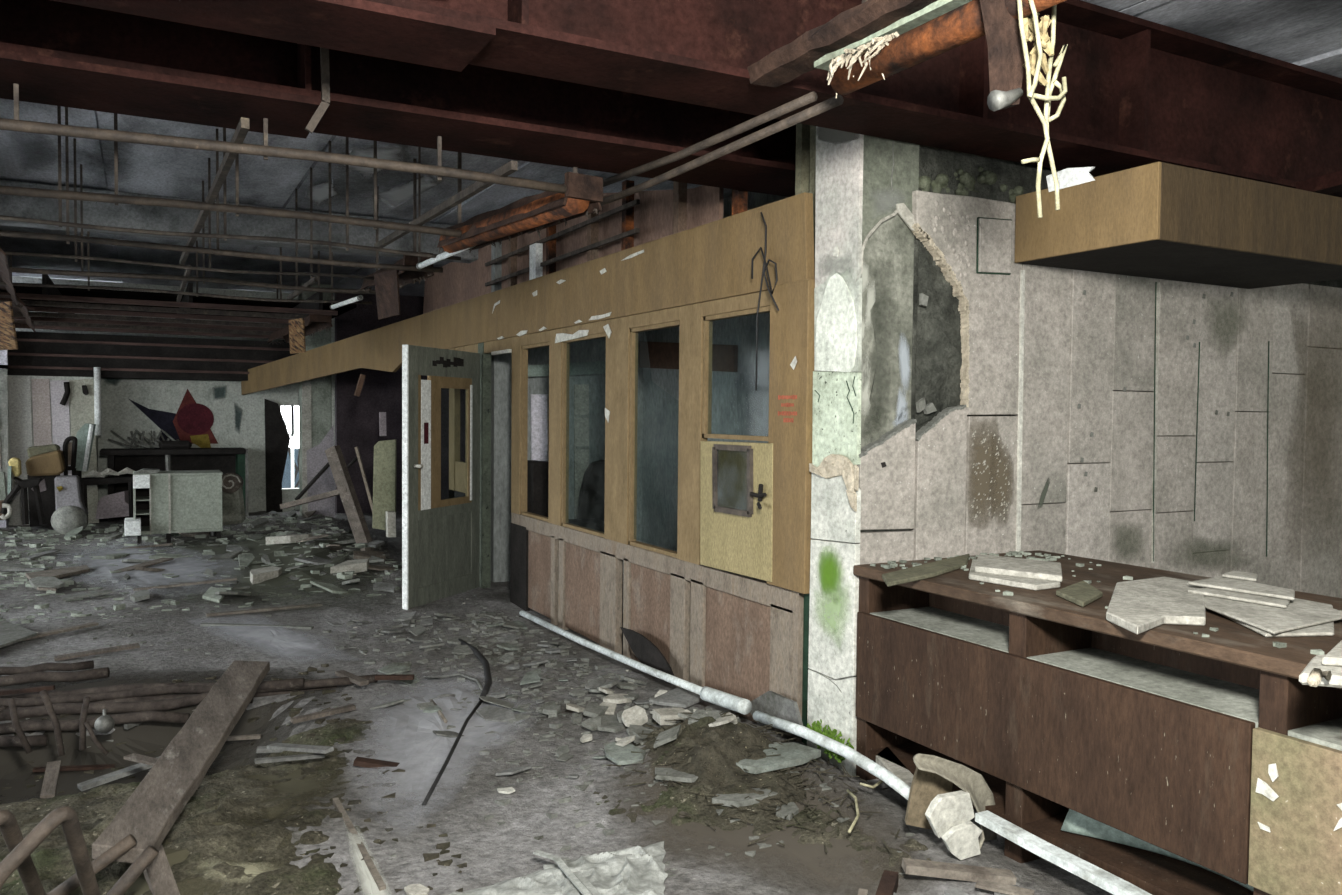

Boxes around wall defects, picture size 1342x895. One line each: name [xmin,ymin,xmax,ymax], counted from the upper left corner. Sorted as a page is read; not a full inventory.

peeling [497,312,612,343]
flaking render [809,135,970,512]
water stain [970,428,1012,523]